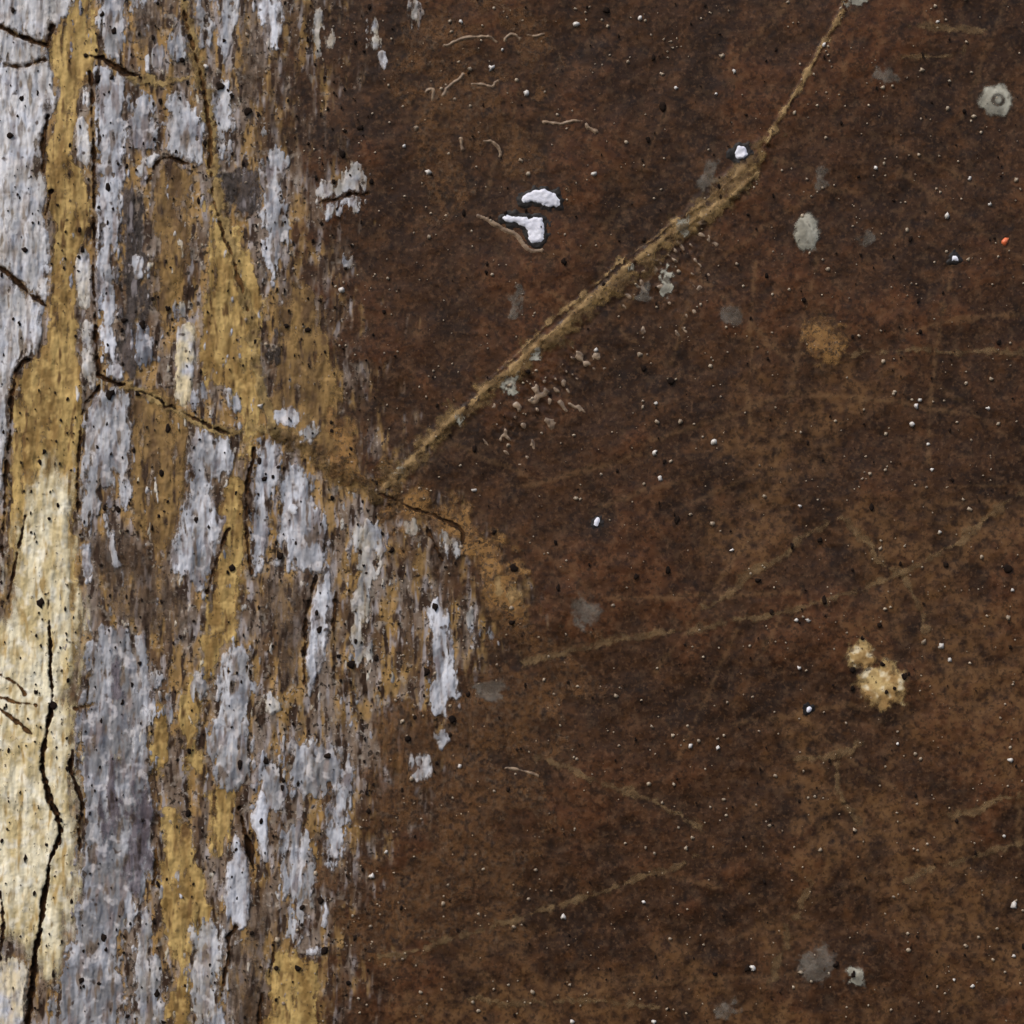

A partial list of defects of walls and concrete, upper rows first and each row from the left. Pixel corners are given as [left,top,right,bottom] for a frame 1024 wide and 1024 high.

rust [391,1,547,226]
rust [471,0,565,101]
crack [0,266,47,306]
crack [205,446,256,594]
peeling [0,0,480,1024]
crack [379,493,465,562]
crack [0,600,90,1024]
rust [306,857,339,894]
peeling [401,596,500,792]
rust [326,611,605,967]